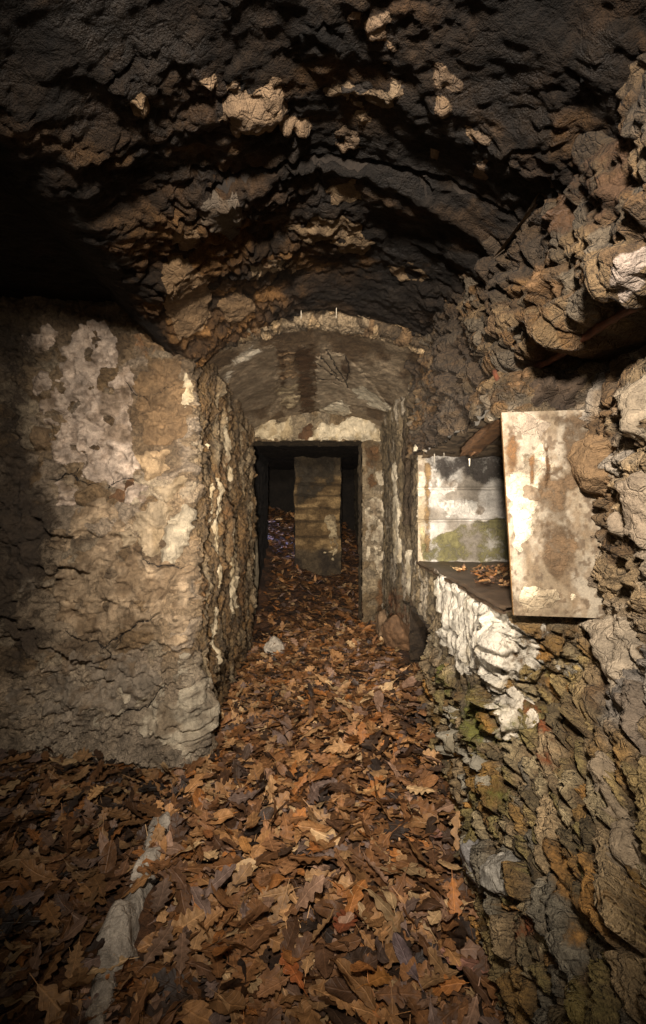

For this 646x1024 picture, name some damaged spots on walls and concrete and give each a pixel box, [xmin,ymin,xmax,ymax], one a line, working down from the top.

damp [277,344,348,414]
damp [340,359,391,412]
peeling [4,319,221,760]
crack [141,554,191,569]
crack [65,613,160,661]
crack [106,685,165,717]
damp [433,574,578,802]